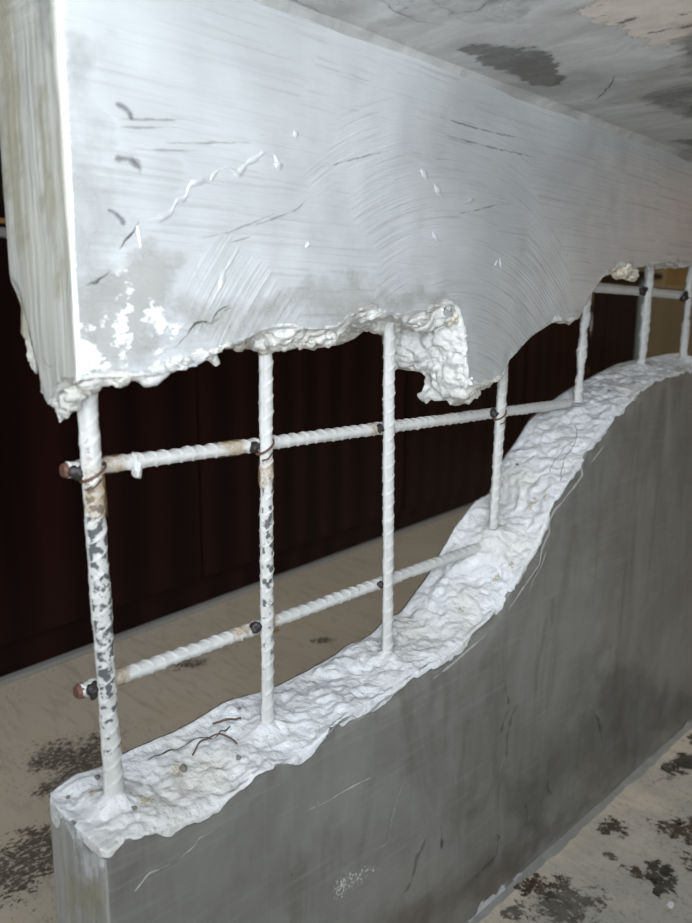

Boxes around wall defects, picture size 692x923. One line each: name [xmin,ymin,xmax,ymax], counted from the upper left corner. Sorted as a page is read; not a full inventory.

damp [459,44,565,87]
spalling [25,336,38,374]
peeling [40,261,223,423]
spalling [245,337,267,350]
spalling [280,336,316,350]